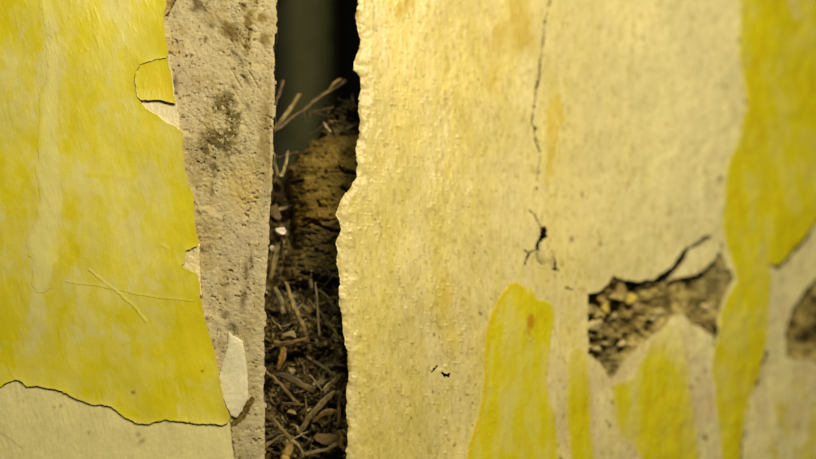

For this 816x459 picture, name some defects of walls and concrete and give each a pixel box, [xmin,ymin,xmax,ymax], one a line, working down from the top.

spalling [0,0,277,459]
water stain [213,0,274,63]
water stain [244,63,273,204]
peeling [465,0,816,459]